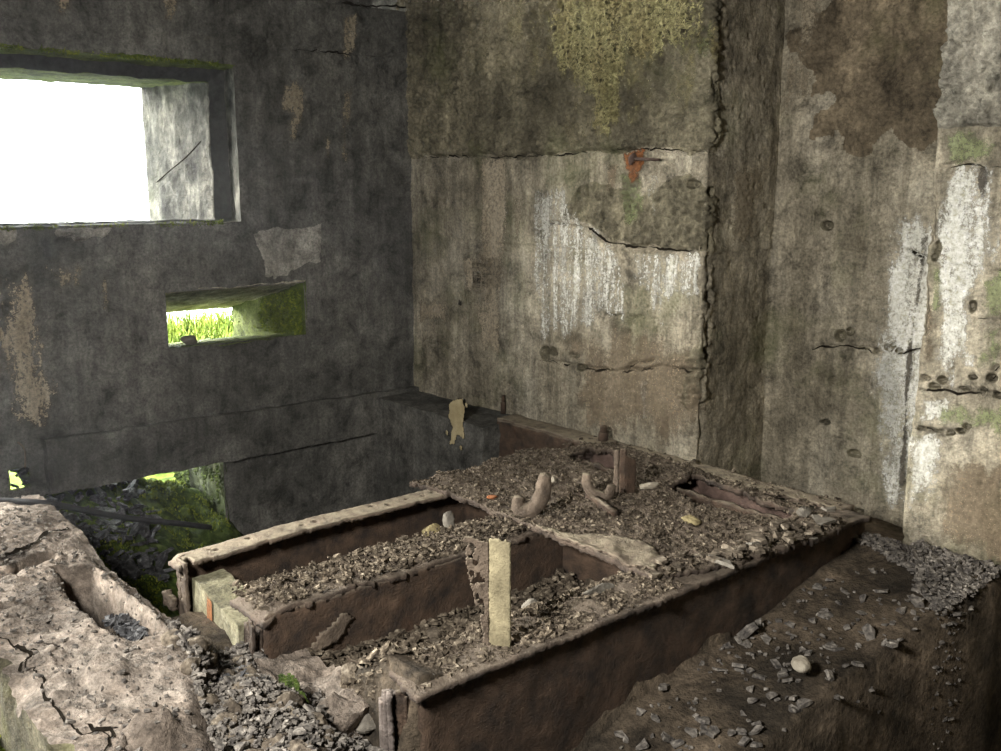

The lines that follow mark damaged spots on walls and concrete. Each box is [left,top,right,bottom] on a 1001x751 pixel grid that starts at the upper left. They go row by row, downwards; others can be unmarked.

crack [424,147,714,159]
corrosion [608,148,645,189]
crack [550,223,698,252]
spalling [539,346,588,371]
crack [812,345,921,355]
water stain [874,165,1001,562]
spalling [921,375,948,389]
spalling [959,372,1001,400]